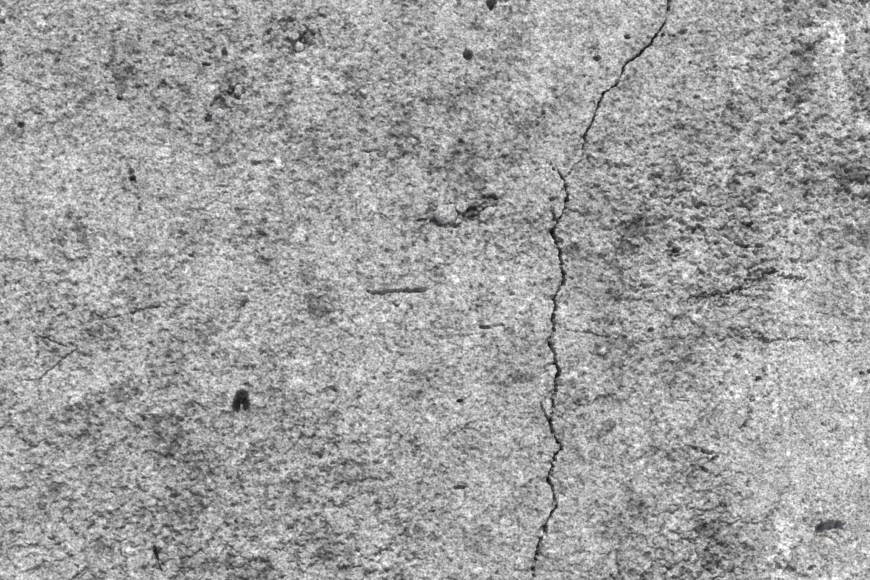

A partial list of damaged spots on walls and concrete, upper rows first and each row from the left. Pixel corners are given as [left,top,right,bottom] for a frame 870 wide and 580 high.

crack [531,0,672,580]